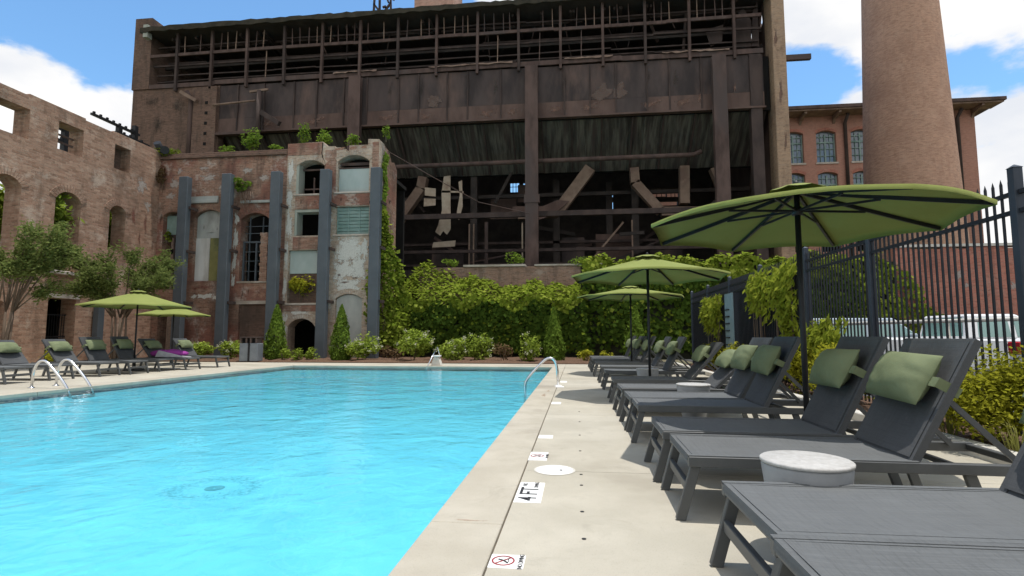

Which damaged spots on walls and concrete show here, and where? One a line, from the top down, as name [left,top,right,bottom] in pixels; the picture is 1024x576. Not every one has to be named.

peeling [332,236,368,291]